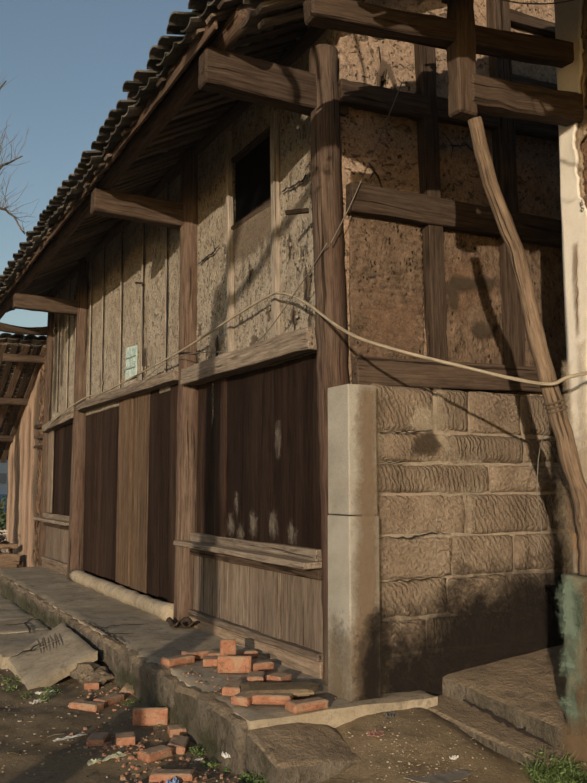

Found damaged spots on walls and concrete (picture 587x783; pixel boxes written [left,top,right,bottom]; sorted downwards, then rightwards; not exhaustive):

crack [4,619,43,658]
crack [81,620,141,644]